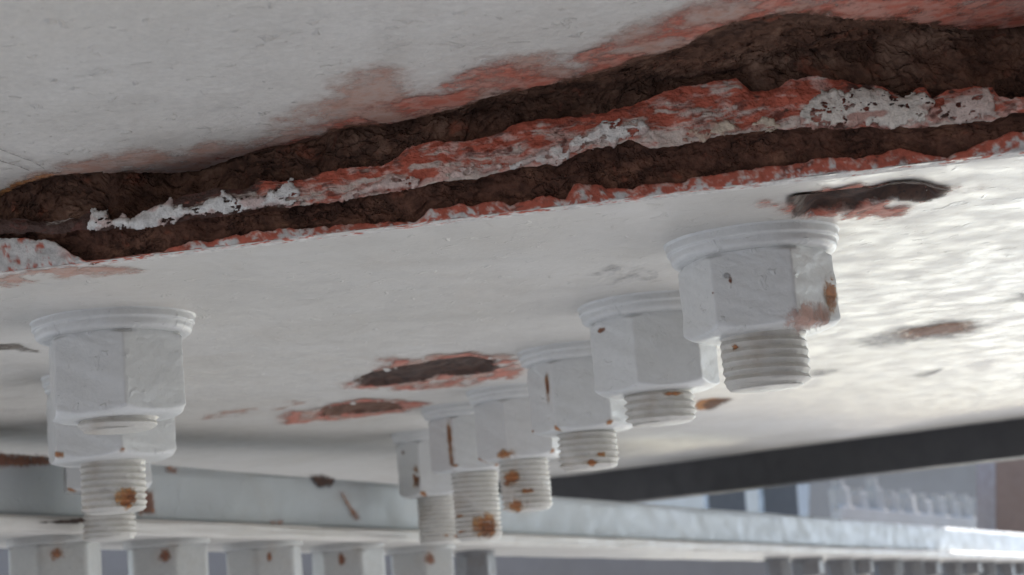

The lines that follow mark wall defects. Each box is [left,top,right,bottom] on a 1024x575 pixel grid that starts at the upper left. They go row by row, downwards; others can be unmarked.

rust [0,0,1024,198]
peeling [0,76,1024,288]
rust [0,112,1024,265]
rust [786,279,837,332]
rust [115,488,155,515]
rust [444,512,495,538]
rust [478,449,534,512]